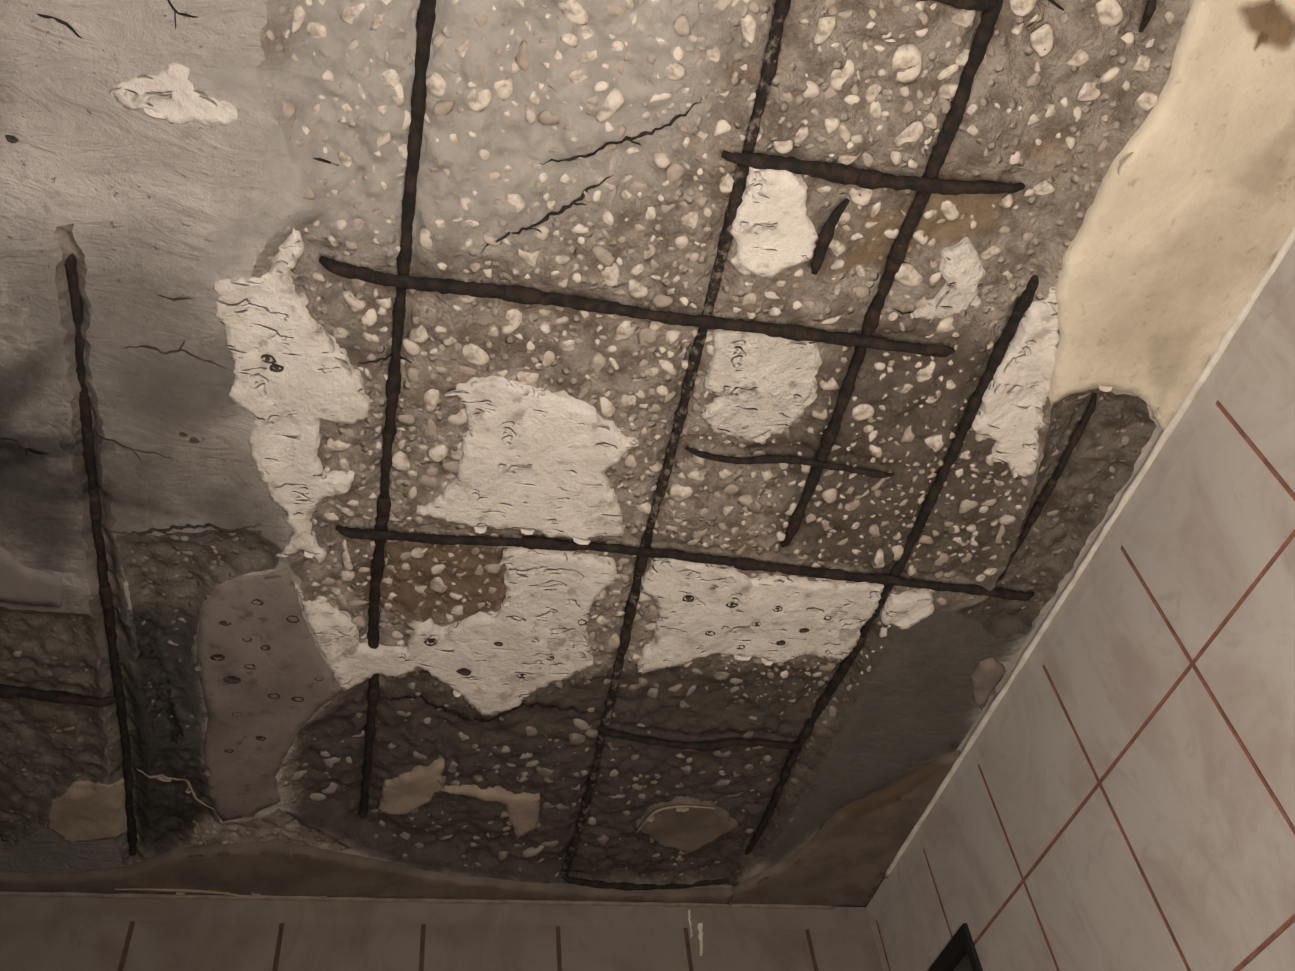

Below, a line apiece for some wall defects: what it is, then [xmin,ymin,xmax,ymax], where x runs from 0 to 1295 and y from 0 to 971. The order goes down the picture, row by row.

crack [36,13,83,39]
crack [167,0,197,29]
crack [481,98,702,253]
rust [851,178,992,262]
spalling [936,200,965,224]
spalling [254,347,284,372]
spalling [904,376,956,416]
spalling [850,404,915,463]
spalling [925,435,944,453]
spalling [944,518,987,546]
spalling [415,557,448,598]
rust [364,545,502,621]